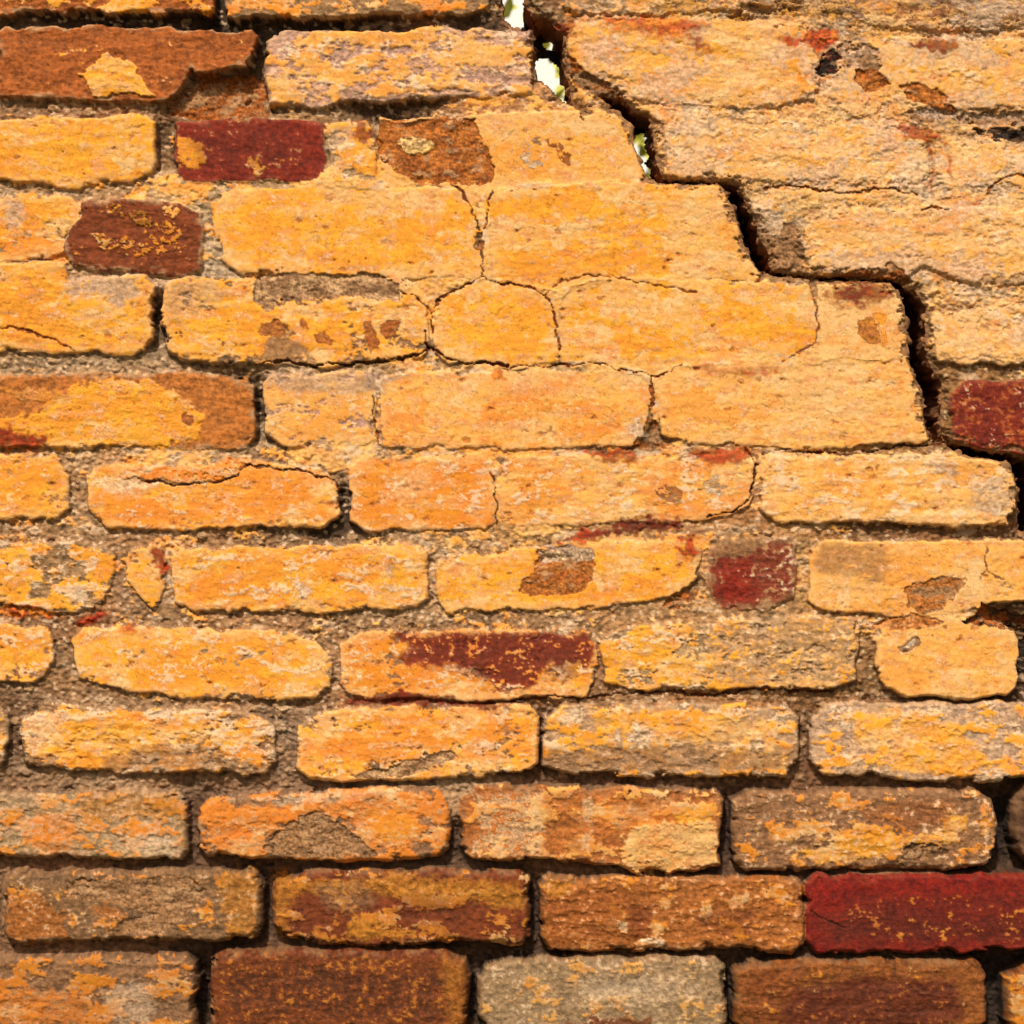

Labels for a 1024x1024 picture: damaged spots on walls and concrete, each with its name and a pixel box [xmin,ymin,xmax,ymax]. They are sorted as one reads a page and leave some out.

crack [500,0,1024,533]
spalling [518,543,596,596]